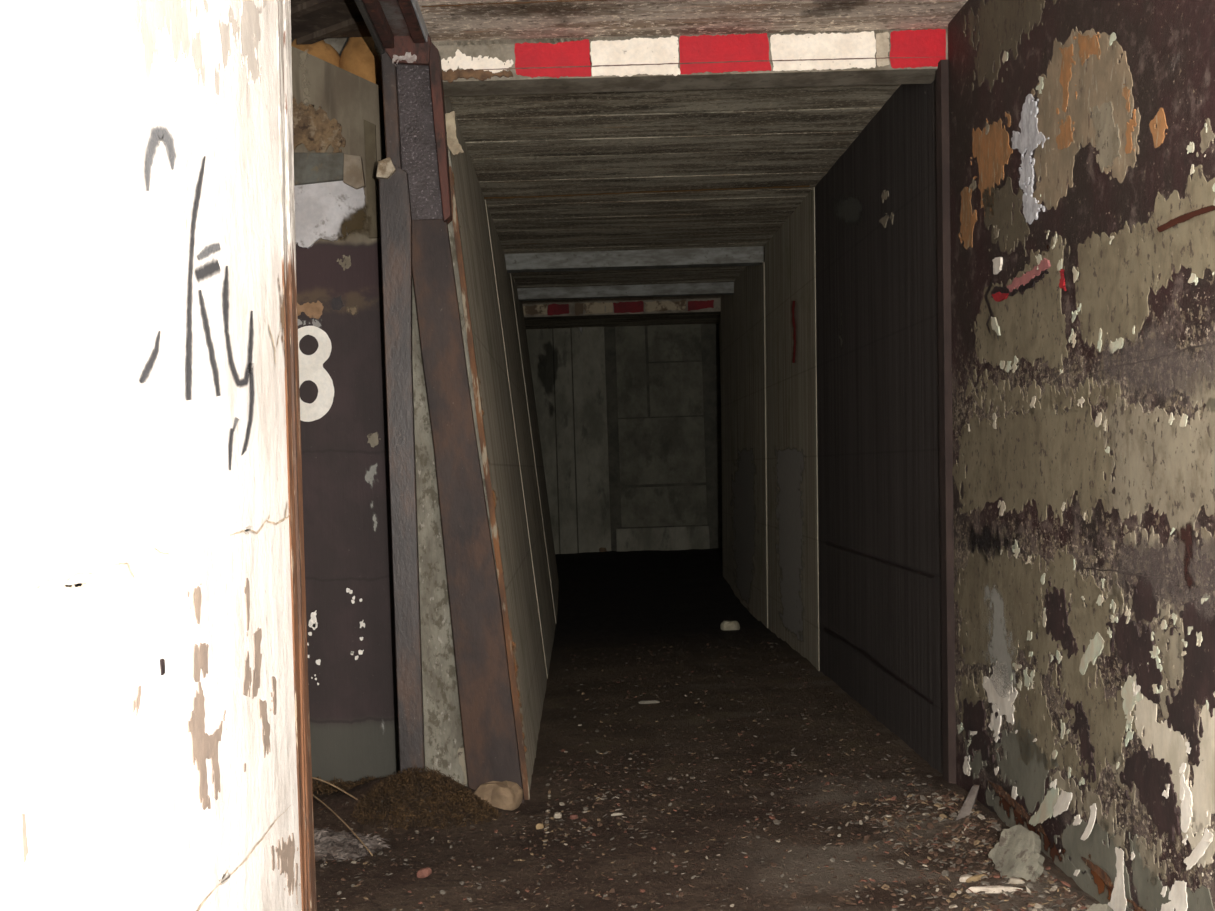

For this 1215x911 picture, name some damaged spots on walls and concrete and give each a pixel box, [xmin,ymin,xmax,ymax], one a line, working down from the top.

peeling [130,0,267,96]
peeling [963,0,1056,92]
peeling [952,27,1215,556]
crack [232,503,290,535]
peeling [187,583,202,624]
peeling [243,578,277,758]
peeling [188,643,227,810]
peeling [954,539,1215,911]
crack [197,805,291,911]
peeling [271,833,300,905]
rust [988,780,1066,862]
rust [1081,854,1114,901]